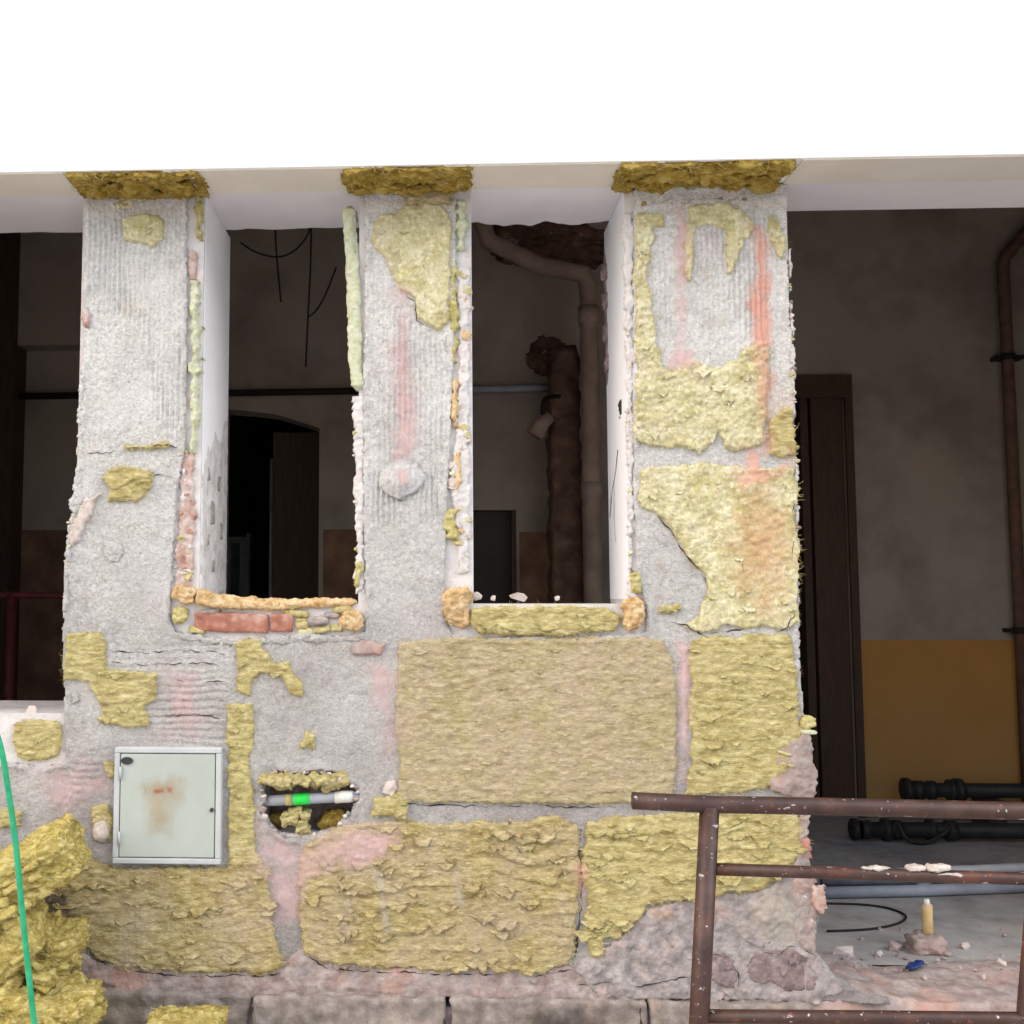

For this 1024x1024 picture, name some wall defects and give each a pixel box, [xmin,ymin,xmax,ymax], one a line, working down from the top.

flaking render [621,173,781,598]
flaking render [785,248,802,548]
peeling [696,737,739,775]
flaking render [770,728,818,797]
spalling [235,769,359,838]
peeling [369,811,517,941]
peeling [480,830,557,854]
peeling [579,824,698,889]
peeling [70,870,696,1000]